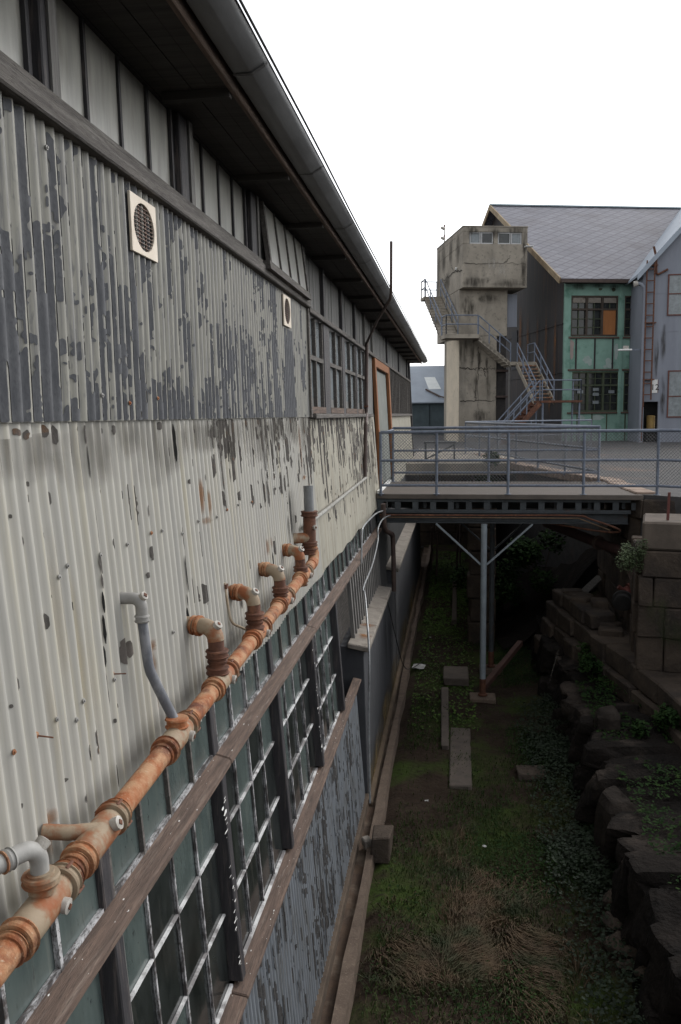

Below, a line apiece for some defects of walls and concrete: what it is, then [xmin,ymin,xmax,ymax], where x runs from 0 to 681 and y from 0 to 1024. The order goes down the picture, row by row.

crack [439,255,525,283]
peeling [0,97,377,523]
peeling [192,581,209,605]
peeling [120,638,134,664]
peeling [257,717,363,1024]